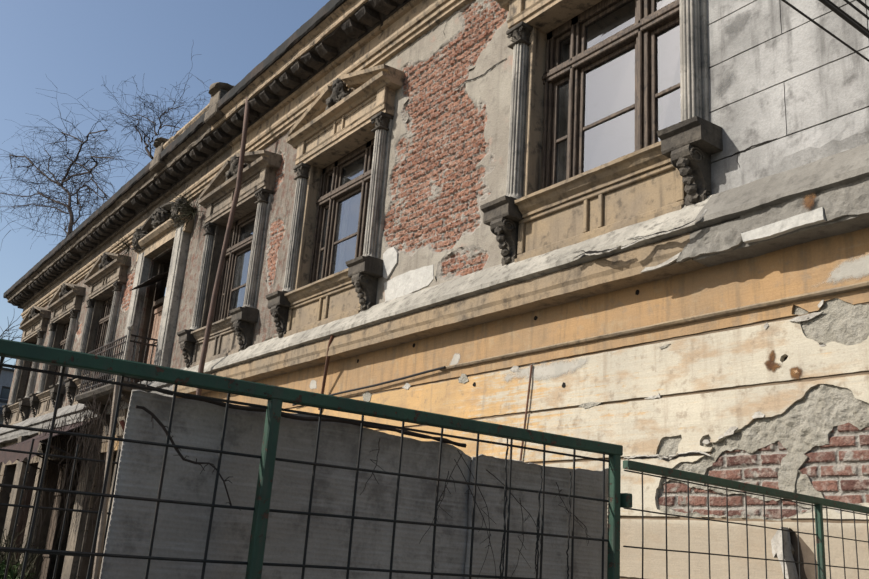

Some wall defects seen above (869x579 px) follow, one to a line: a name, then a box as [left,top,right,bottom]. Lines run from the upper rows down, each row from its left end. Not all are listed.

flaking render [382,0,508,282]
flaking render [265,217,287,292]
peeling [827,255,869,282]
flaking render [789,298,869,347]
corrosion [764,350,802,379]
flaking render [656,384,869,521]